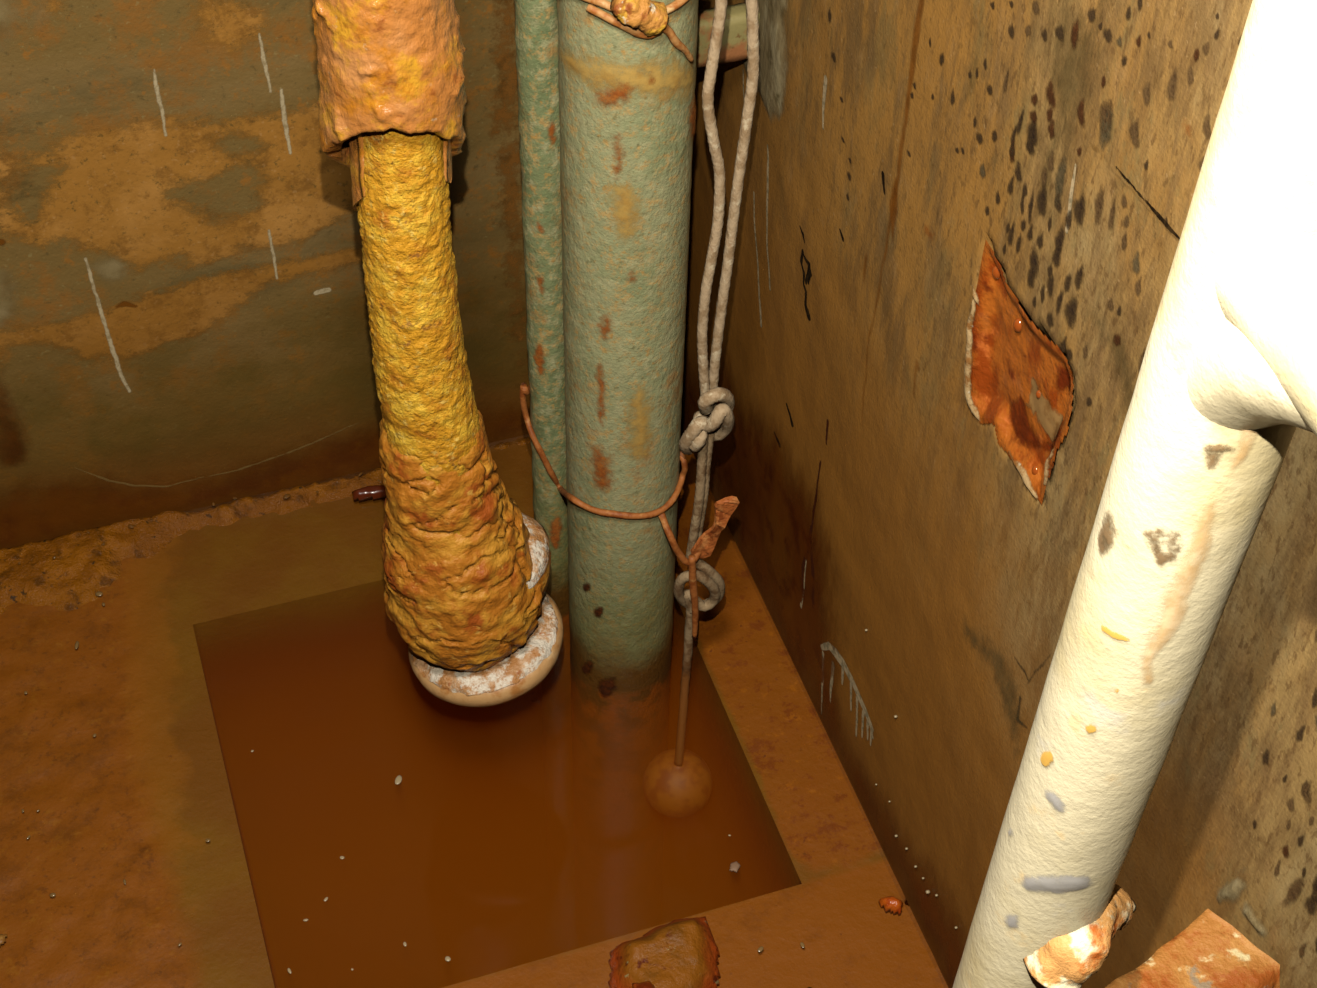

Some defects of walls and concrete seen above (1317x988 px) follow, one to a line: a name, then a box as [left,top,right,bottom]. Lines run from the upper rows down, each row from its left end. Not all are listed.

spalling [969,59,1008,94]
spalling [1008,1,1150,65]
spalling [1168,13,1219,98]
spalling [1203,116,1211,138]
crack [1094,147,1180,240]
spalling [964,82,1141,505]